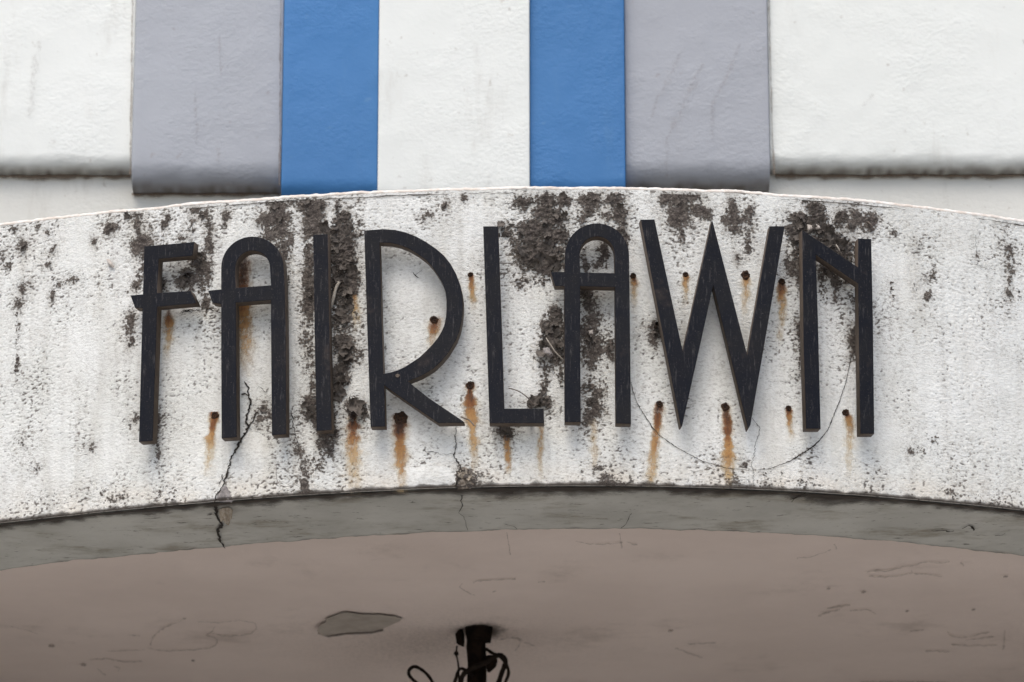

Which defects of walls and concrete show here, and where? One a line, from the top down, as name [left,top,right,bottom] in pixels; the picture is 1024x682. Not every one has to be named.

leakage [0,191,1024,529]
rust [205,411,219,458]
crack [209,382,269,548]
rust [347,415,360,463]
rust [393,411,408,474]
crack [425,434,468,530]
rust [464,381,477,451]
rust [649,401,663,480]
rust [721,402,735,479]
crack [631,356,852,481]
rust [842,409,853,437]
peeling [317,612,402,637]